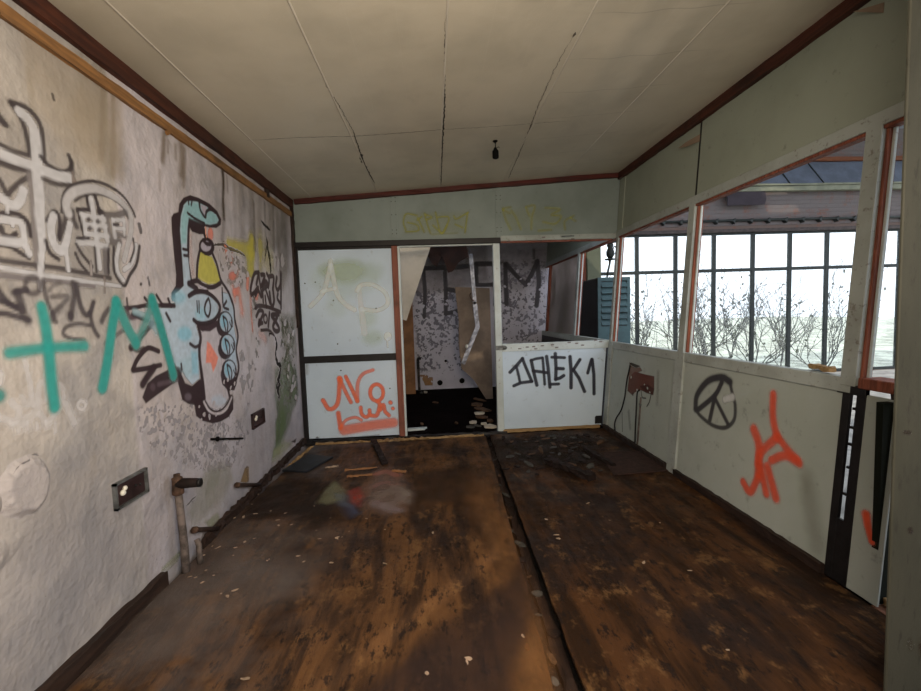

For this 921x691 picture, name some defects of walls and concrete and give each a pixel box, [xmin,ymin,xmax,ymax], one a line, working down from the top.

crack [264,32,576,184]
peeling [414,290,465,385]